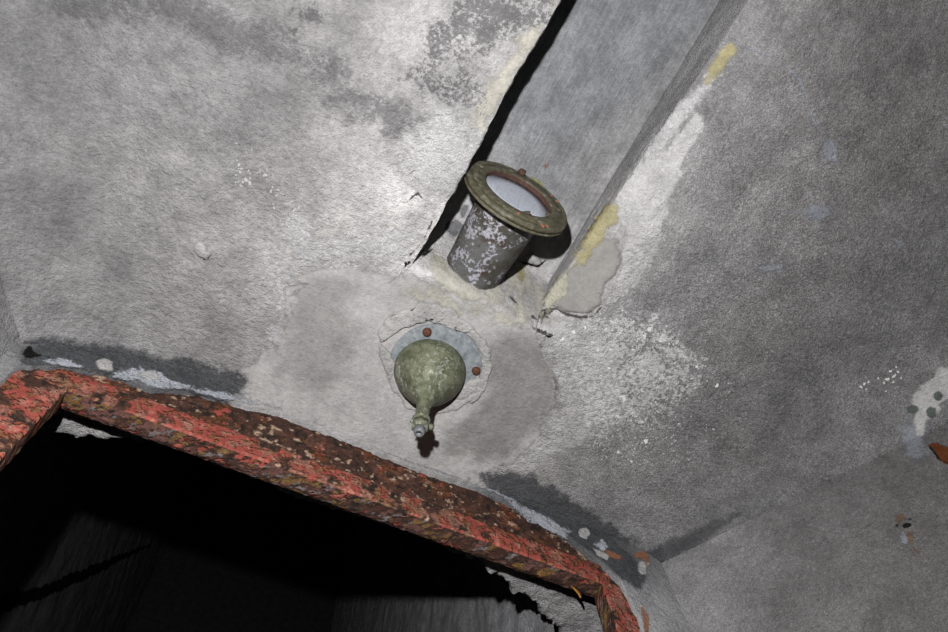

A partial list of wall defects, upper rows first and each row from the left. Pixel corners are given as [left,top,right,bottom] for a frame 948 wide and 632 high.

crack [404,221,432,267]
leakage [403,43,737,589]
leakage [21,337,252,405]
peeling [898,367,948,460]
rust [929,443,948,464]
rust [634,551,650,575]